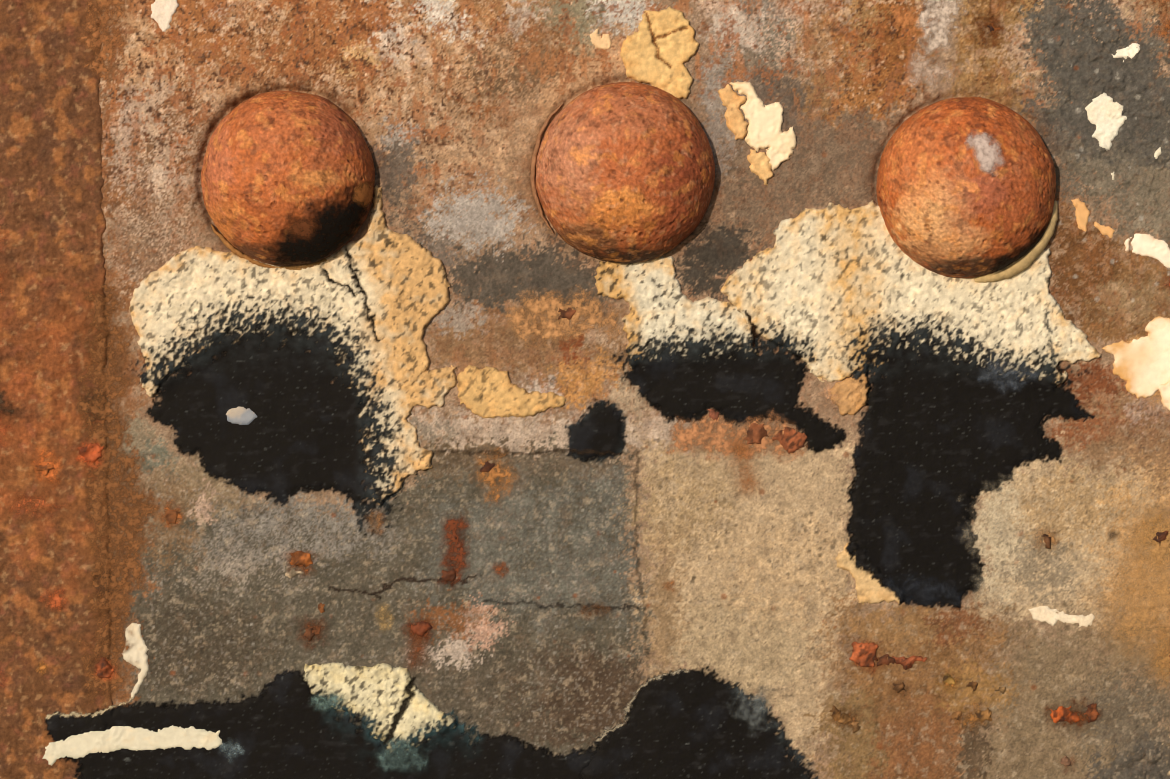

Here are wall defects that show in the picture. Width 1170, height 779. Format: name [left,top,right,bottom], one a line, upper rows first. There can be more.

rust [80,0,125,79]
peeling [590,6,699,99]
rust [530,103,563,234]
peeling [718,81,797,185]
rust [211,224,276,268]
crack [323,249,380,342]
peeling [595,198,1170,416]
rust [35,449,59,482]
rust [441,519,468,583]
rust [849,637,927,696]